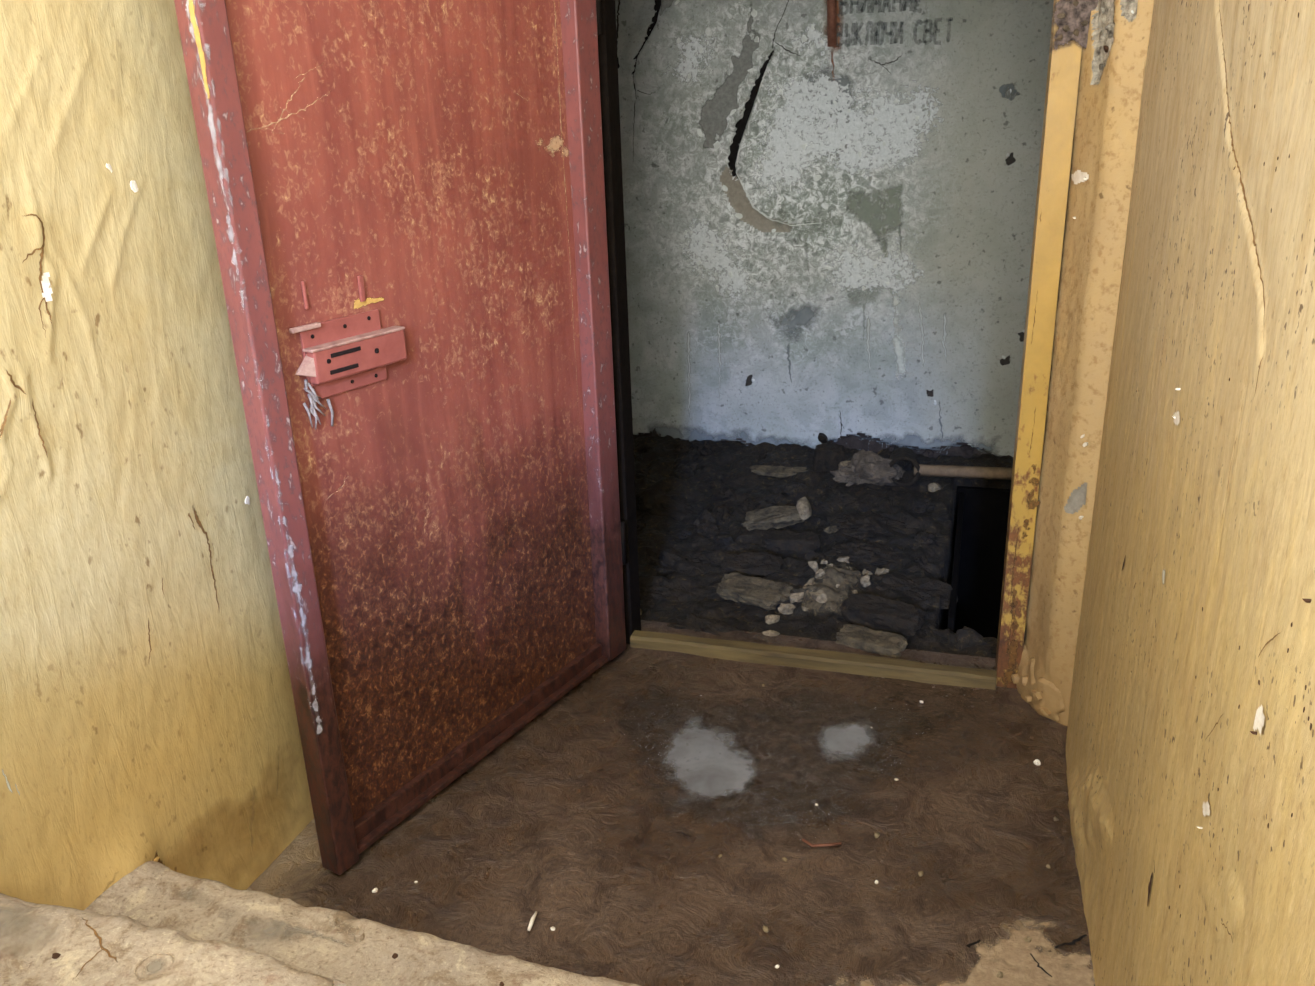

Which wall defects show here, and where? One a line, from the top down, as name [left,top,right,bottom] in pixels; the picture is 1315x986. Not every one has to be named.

peeling [697,8,760,150]
crack [728,0,800,179]
spalling [1090,0,1138,85]
spalling [720,166,818,233]